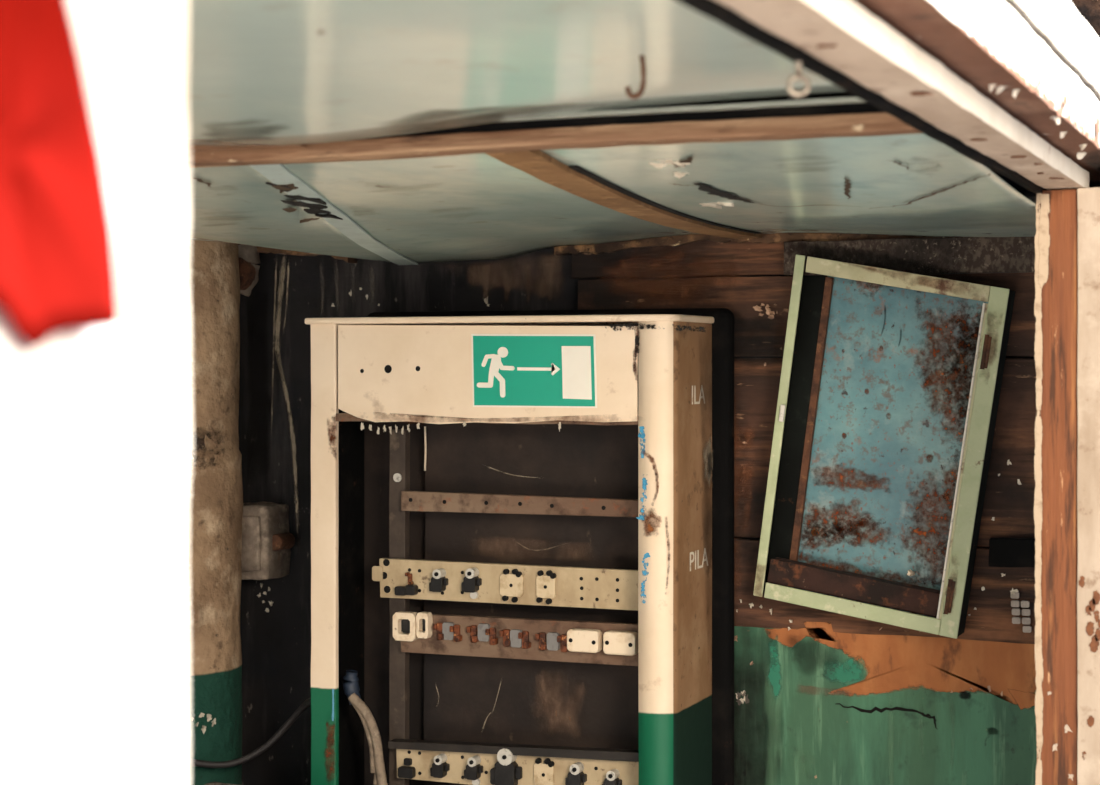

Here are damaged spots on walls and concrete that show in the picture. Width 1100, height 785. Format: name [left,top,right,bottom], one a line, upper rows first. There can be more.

peeling [952,17,1100,160]
peeling [753,303,778,319]
peeling [765,193,1058,785]
crack [835,703,937,729]